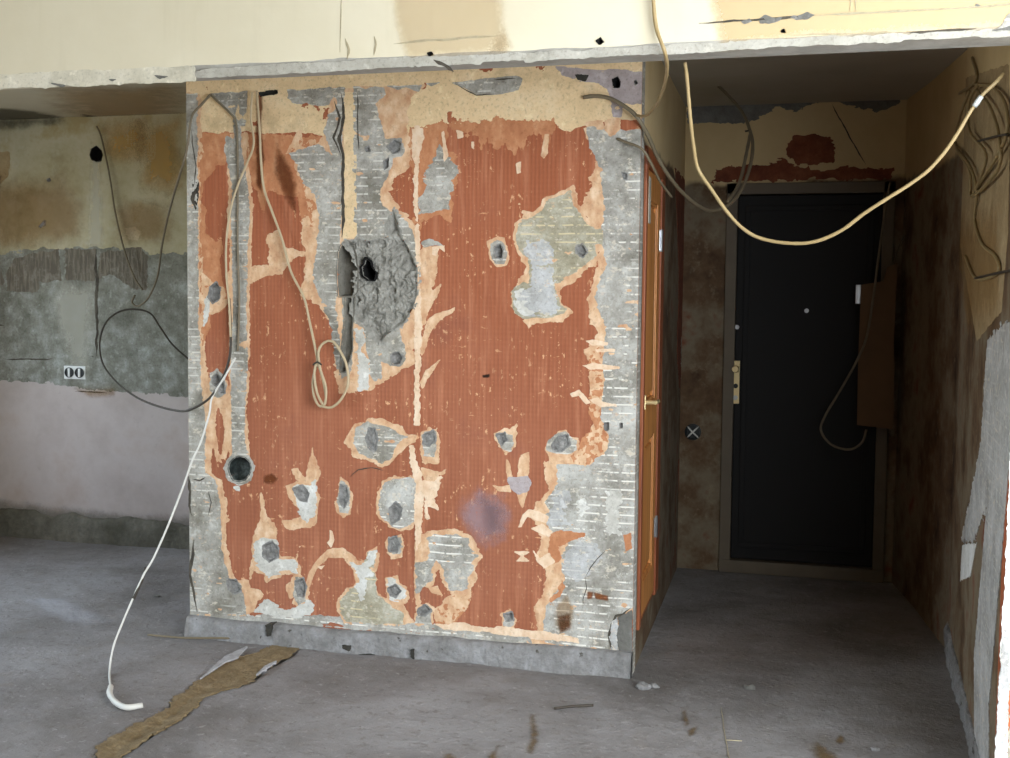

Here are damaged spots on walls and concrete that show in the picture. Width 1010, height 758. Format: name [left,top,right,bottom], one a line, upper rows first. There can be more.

leakage [0,109,54,127]
peeling [711,134,894,184]
flaking render [490,240,508,264]
flaking render [0,82,479,637]
flaking render [511,66,642,652]
flaking render [960,64,1010,758]
spalling [494,421,518,455]
spalling [500,609,517,628]
crack [92,645,299,758]